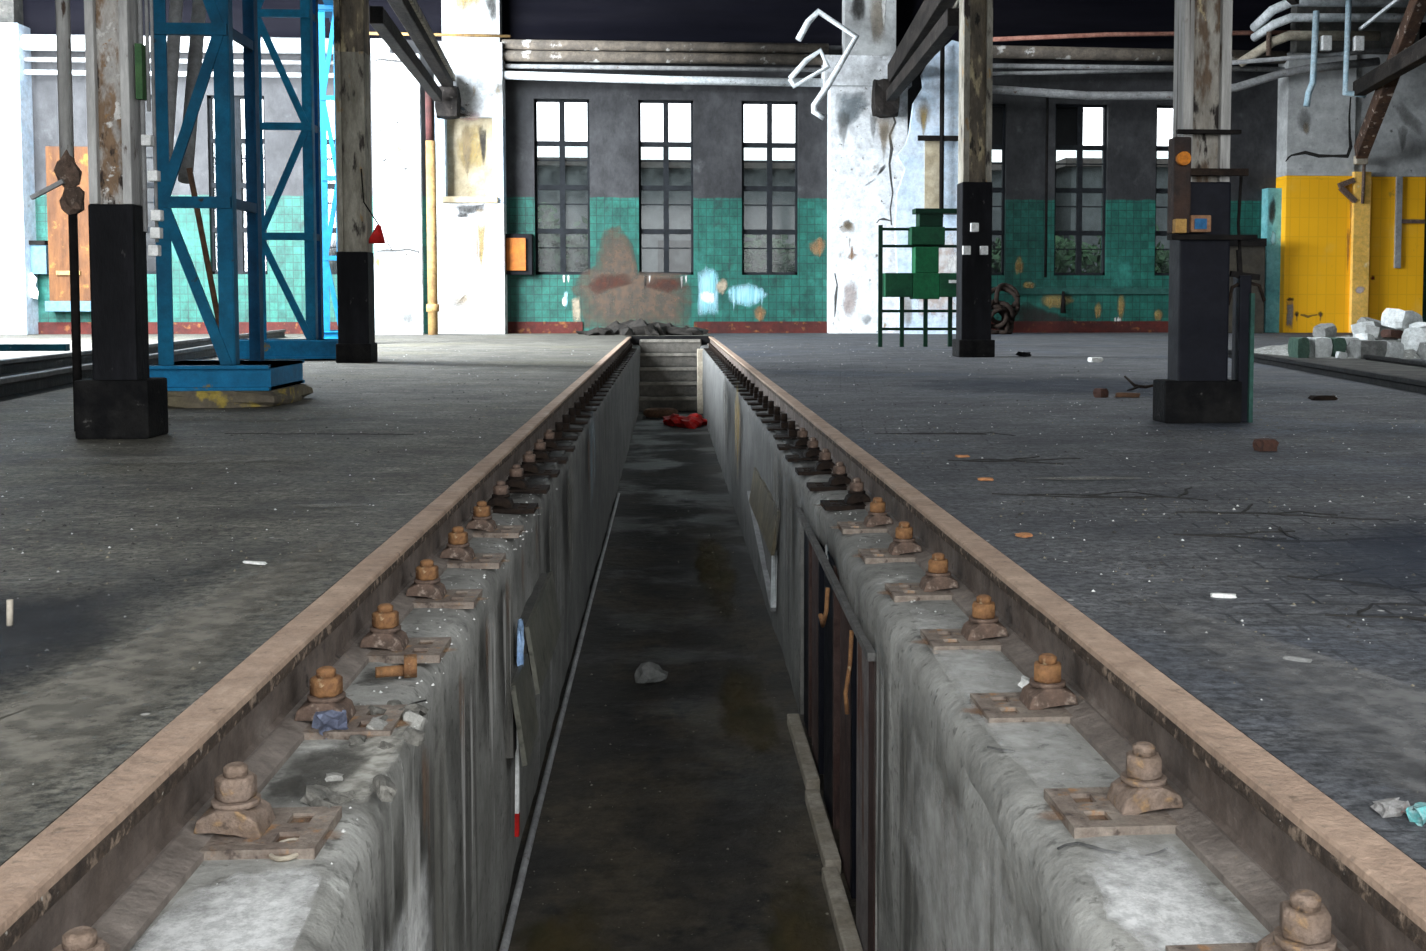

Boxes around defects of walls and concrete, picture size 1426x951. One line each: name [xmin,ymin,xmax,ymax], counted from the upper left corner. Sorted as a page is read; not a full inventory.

crack [876,117,897,225]
peeling [699,271,763,313]